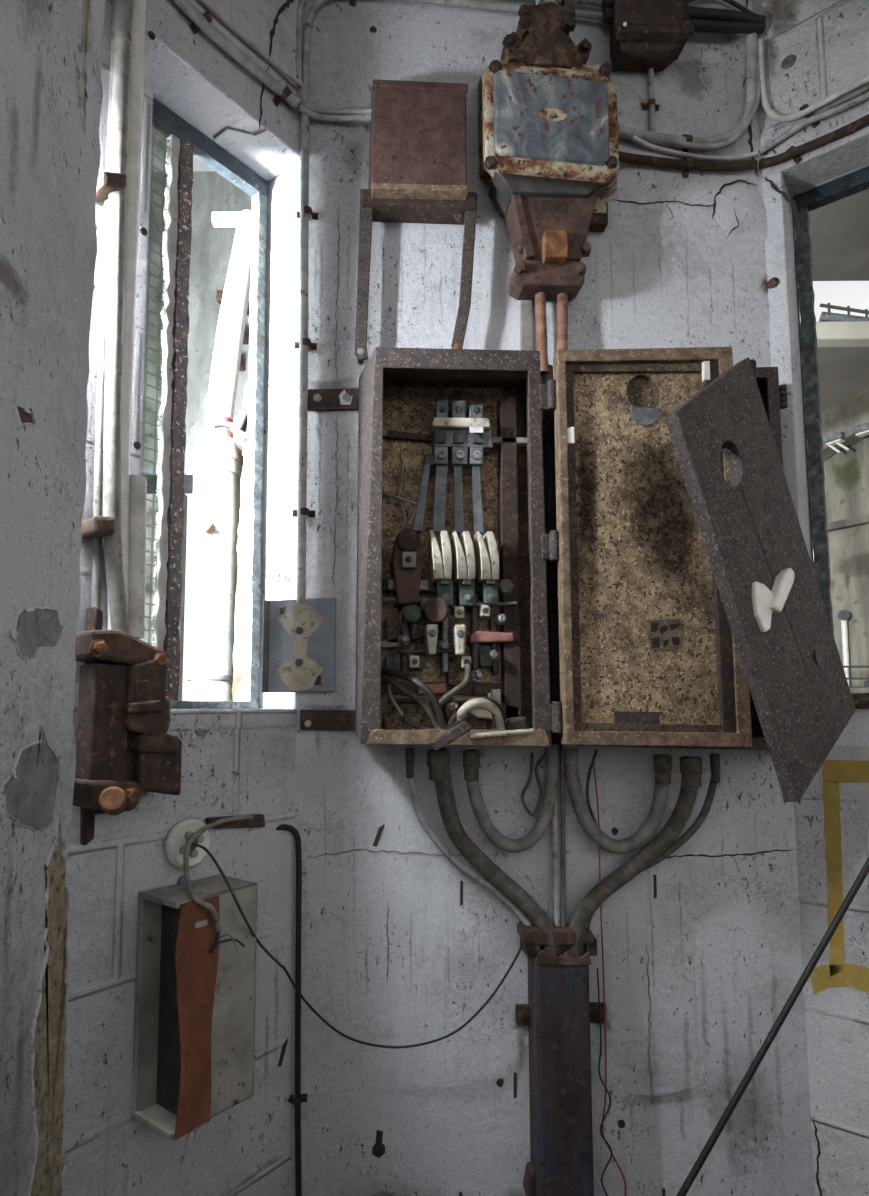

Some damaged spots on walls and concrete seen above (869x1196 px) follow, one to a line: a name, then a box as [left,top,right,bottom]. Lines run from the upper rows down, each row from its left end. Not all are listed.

crack [213,0,294,138]
crack [617,200,714,218]
peeling [10,606,64,660]
flaking render [1,726,70,1196]
crack [813,1117,822,1196]